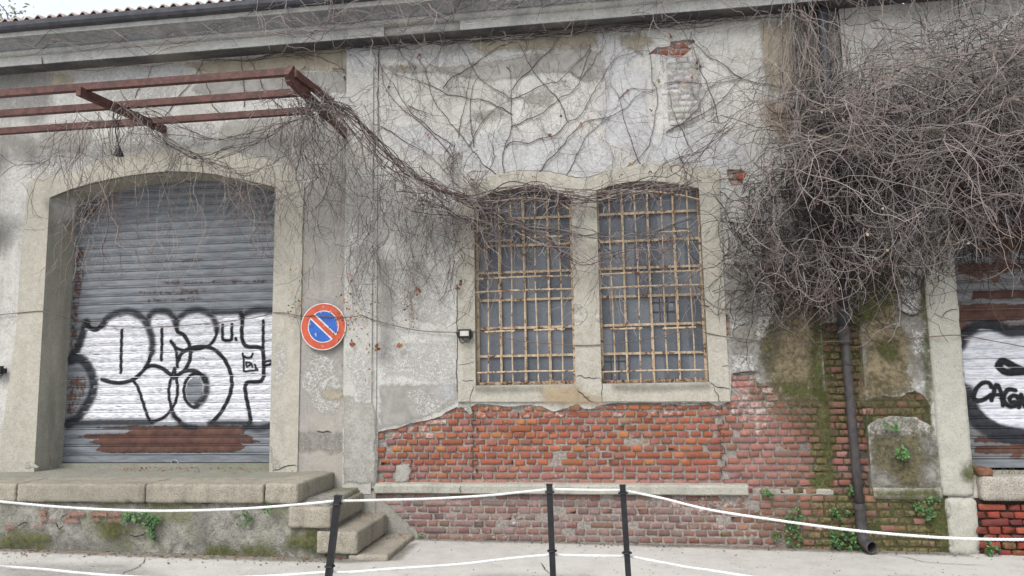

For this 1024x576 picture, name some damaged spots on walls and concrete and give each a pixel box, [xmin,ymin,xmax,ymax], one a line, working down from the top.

peeling [35,33,747,186]
corrosion [80,425,260,453]
peeling [391,260,452,325]
flaking render [298,290,834,488]
water stain [859,253,930,403]